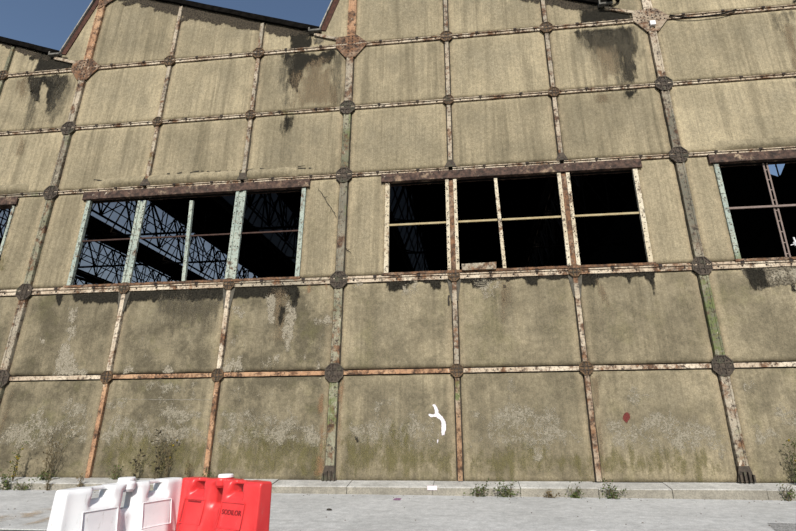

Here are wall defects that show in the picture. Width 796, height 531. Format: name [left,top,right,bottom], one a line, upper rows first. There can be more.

damp [20,51,72,126]
damp [281,31,341,104]
damp [575,5,638,99]